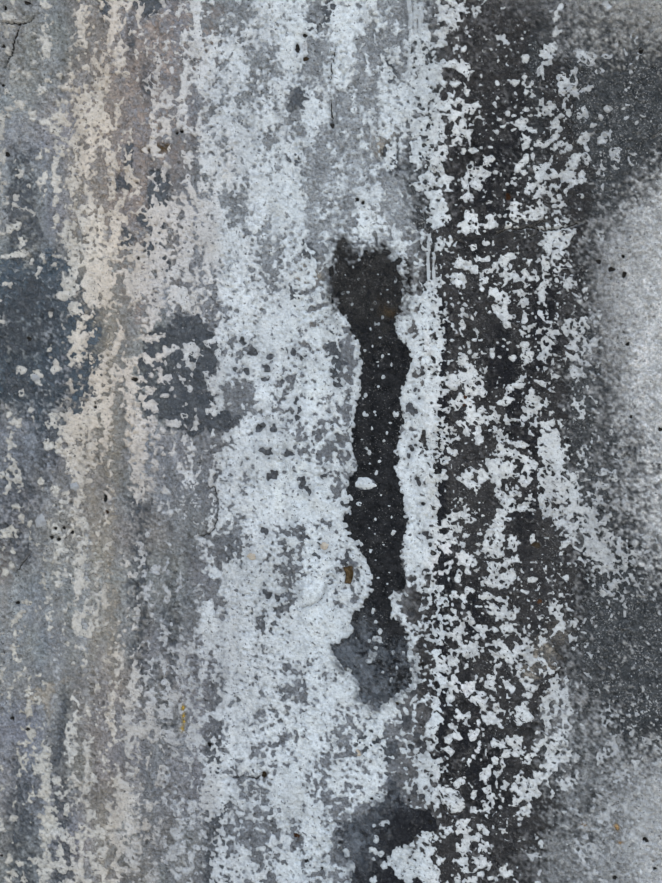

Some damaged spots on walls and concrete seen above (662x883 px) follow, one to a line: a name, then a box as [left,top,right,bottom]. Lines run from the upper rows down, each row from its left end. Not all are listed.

peeling [476,30,530,67]
peeling [529,3,564,80]
peeling [614,33,644,74]
peeling [590,105,613,128]
peeling [597,129,652,187]
crack [497,220,584,236]
peeling [568,385,600,423]
peeling [366,608,383,663]
peeling [548,683,662,883]
peeling [518,834,544,862]